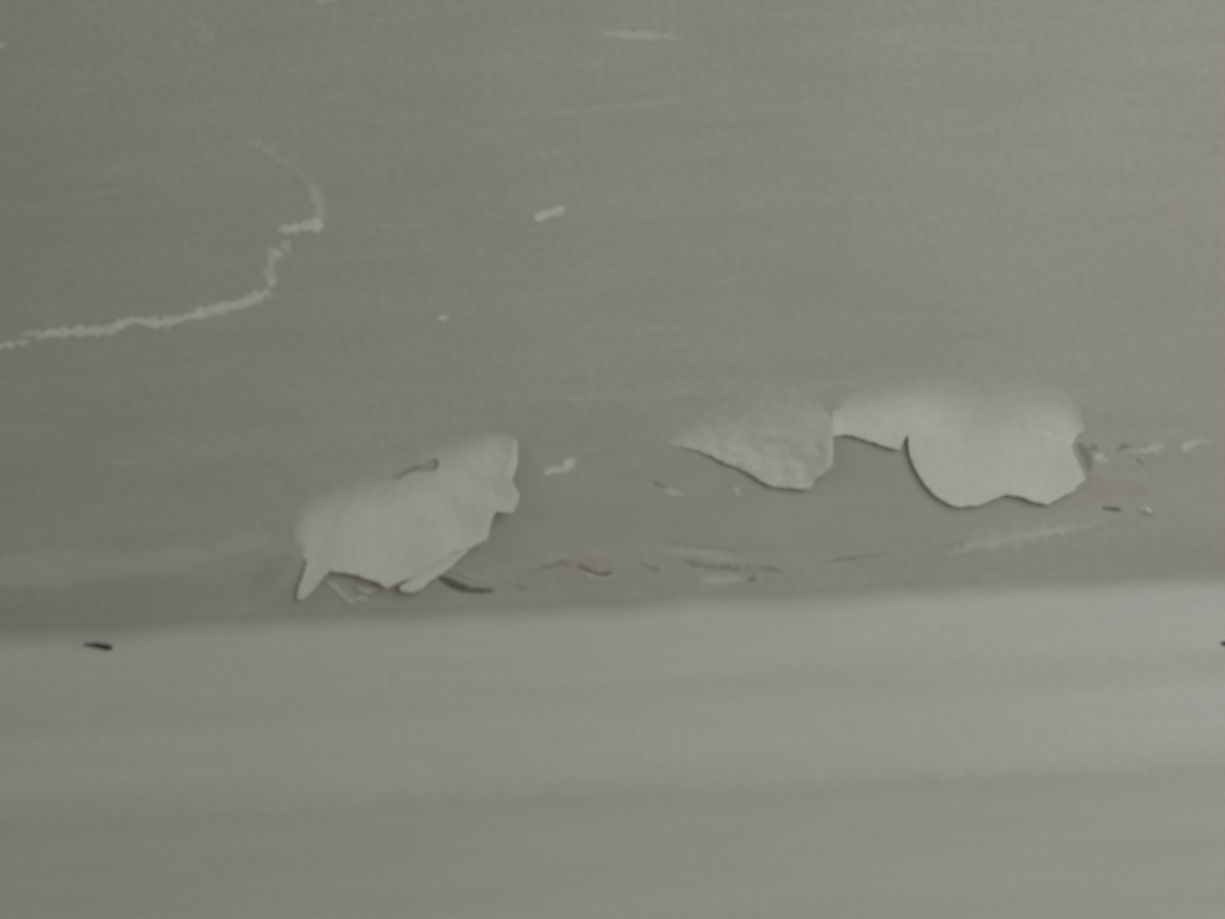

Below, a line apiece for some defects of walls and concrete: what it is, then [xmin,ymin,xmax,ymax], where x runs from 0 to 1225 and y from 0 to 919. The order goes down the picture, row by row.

crack [0,130,343,351]
flaking render [292,376,1156,607]